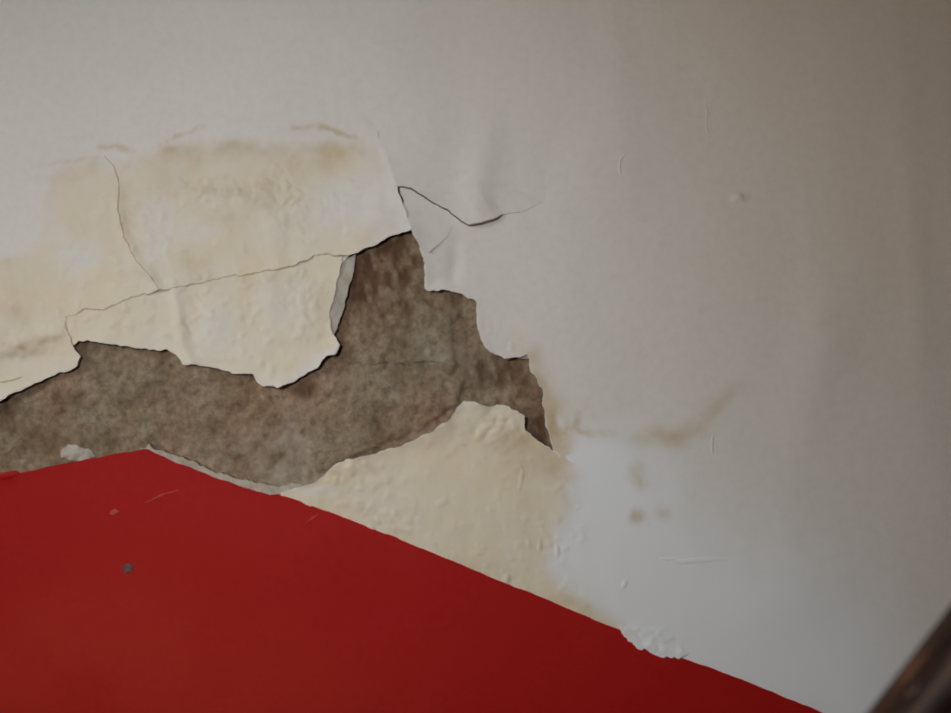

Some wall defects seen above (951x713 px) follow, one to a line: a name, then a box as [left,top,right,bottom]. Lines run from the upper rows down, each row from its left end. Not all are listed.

damp [0,119,401,400]
crack [64,155,349,345]
spalling [0,73,693,659]
damp [281,323,756,629]